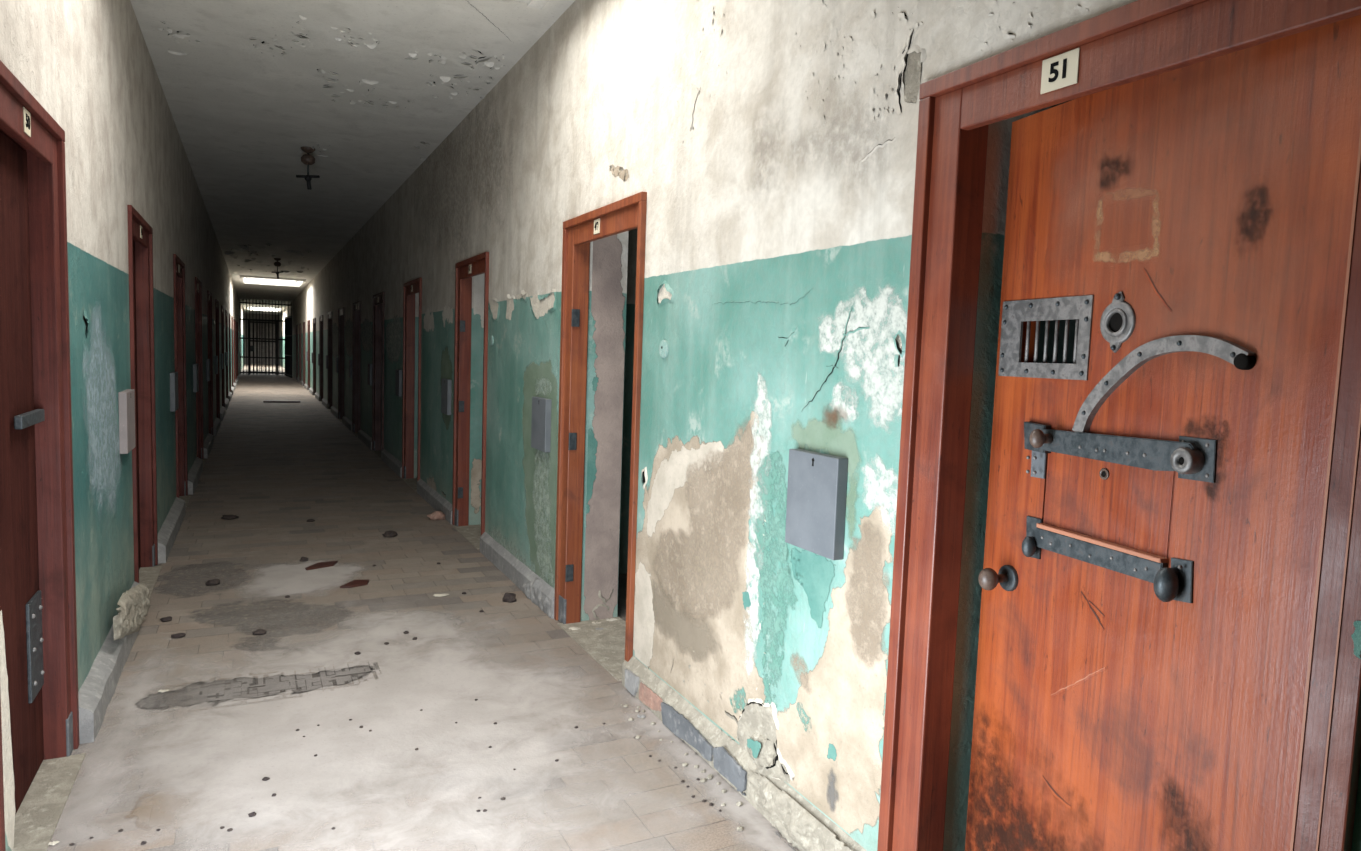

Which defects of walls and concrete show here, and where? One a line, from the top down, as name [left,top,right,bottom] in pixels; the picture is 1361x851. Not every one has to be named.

spalling [871,0,927,120]
peeling [473,273,556,328]
peeling [657,280,675,308]
crack [712,287,813,346]
crack [801,308,870,412]
crack [893,355,901,367]
peeling [893,330,906,359]
flaking render [569,234,625,630]
flaking render [471,458,482,514]
peeling [533,450,554,588]
flaking render [635,411,892,834]